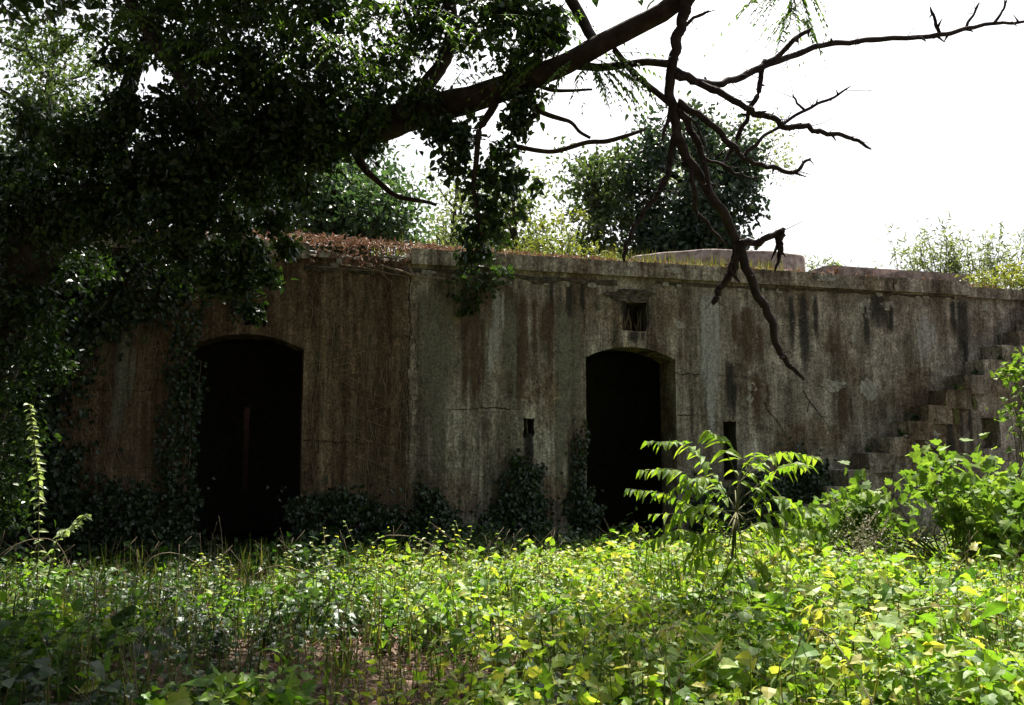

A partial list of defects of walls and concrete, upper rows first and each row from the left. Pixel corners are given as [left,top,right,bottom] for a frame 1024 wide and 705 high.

crack [303,276,520,502]
water stain [488,290,518,411]
water stain [789,294,818,366]
water stain [864,295,894,344]